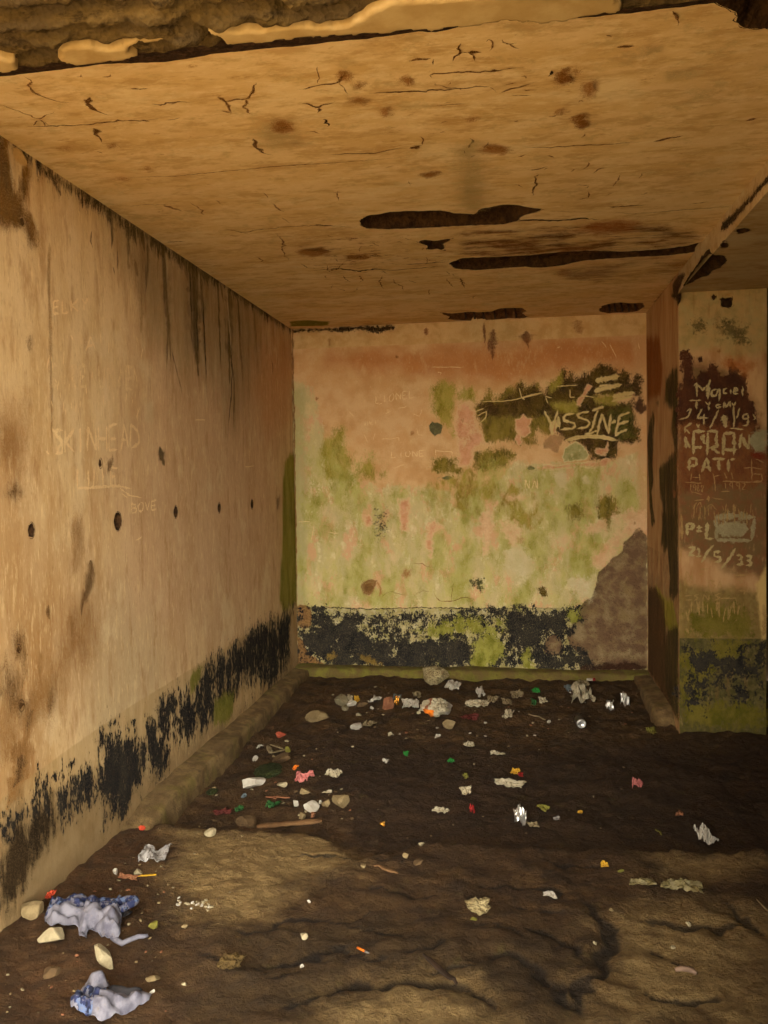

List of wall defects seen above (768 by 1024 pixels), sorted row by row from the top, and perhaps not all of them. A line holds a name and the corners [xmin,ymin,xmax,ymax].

flaking render [0,0,768,76]
crack [3,74,191,153]
crack [154,40,554,185]
crack [516,134,727,222]
water stain [12,144,395,449]
crack [233,193,480,297]
spalling [440,308,528,321]
spalling [360,204,750,286]
spalling [600,302,644,314]
water stain [477,348,768,722]
peeling [0,506,648,845]
water stain [0,789,66,920]